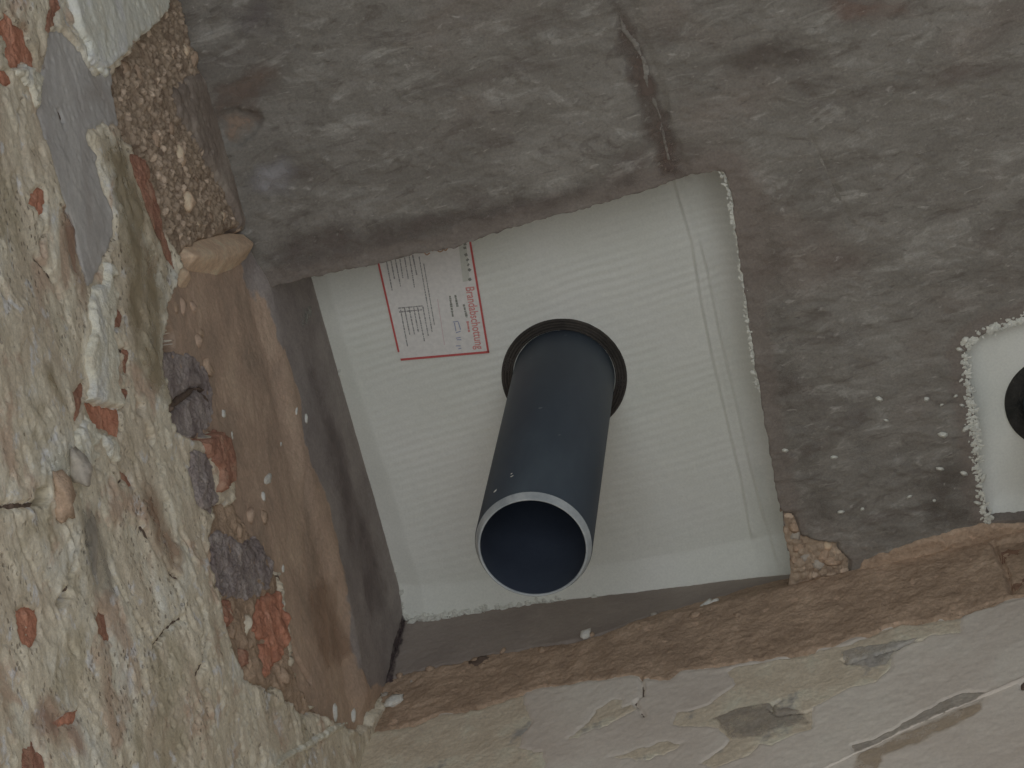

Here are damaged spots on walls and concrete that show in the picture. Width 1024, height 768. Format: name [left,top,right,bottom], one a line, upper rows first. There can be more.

crack [619,15,670,160]
flaking render [129,154,1024,768]